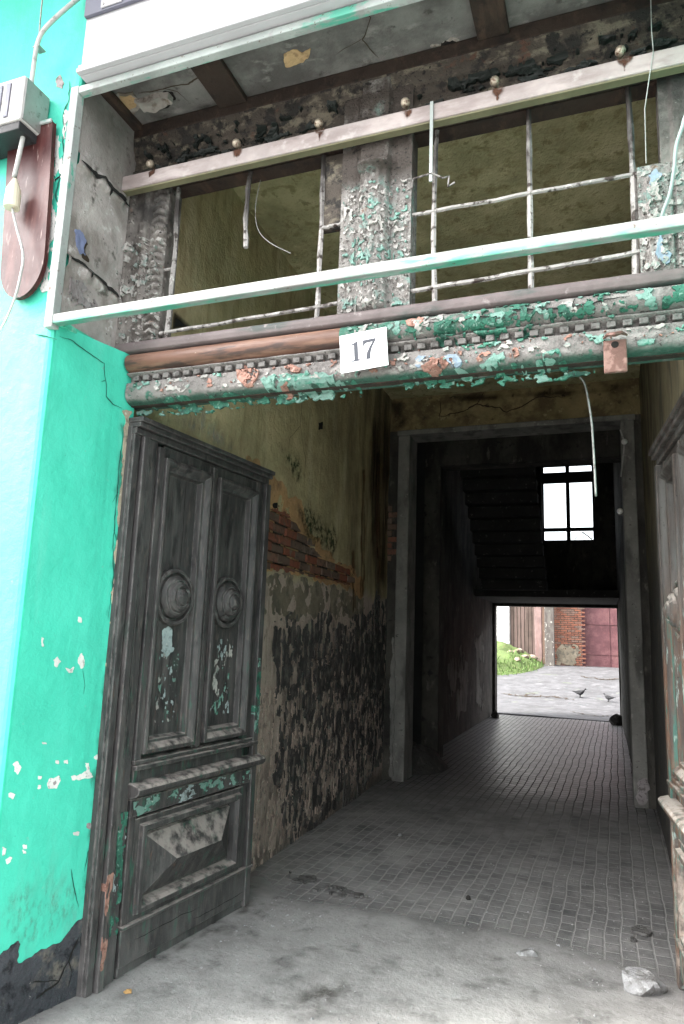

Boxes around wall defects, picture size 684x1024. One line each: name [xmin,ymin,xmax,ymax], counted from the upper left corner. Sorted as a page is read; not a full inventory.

peeling [116,91,176,114]
peeling [144,100,338,169]
peeling [340,179,410,266]
crack [71,256,121,300]
peeling [120,237,167,299]
peeling [340,274,409,313]
peeling [116,283,684,527]
crack [35,334,124,615]
peeling [100,476,397,971]
peeling [37,755,98,789]
peeling [0,918,83,1024]